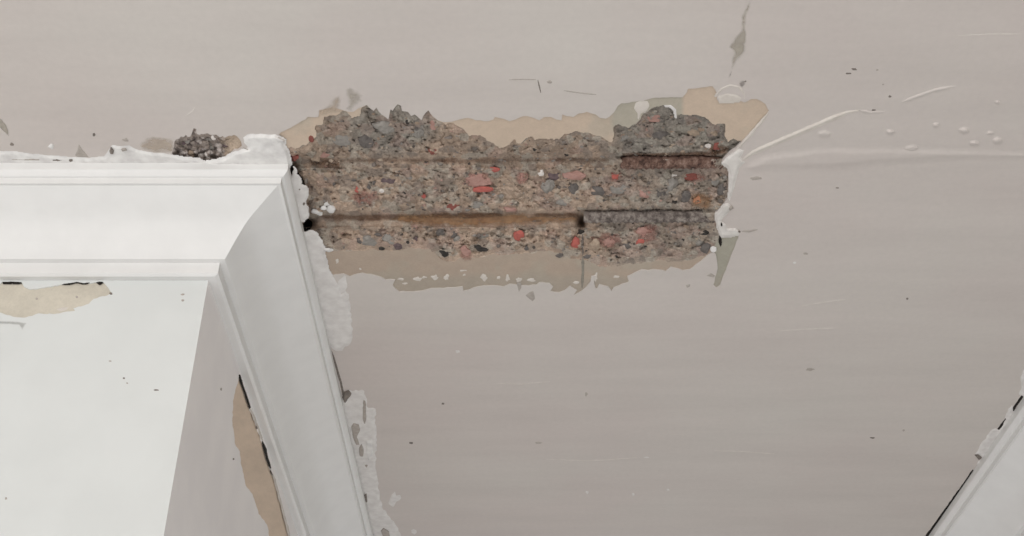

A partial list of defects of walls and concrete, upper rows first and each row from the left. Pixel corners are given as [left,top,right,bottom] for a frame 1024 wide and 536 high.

spalling [172,128,242,161]
rust [623,146,728,157]
spalling [279,86,769,301]
rust [325,213,578,226]
peeling [0,283,110,318]
peeling [232,379,290,536]